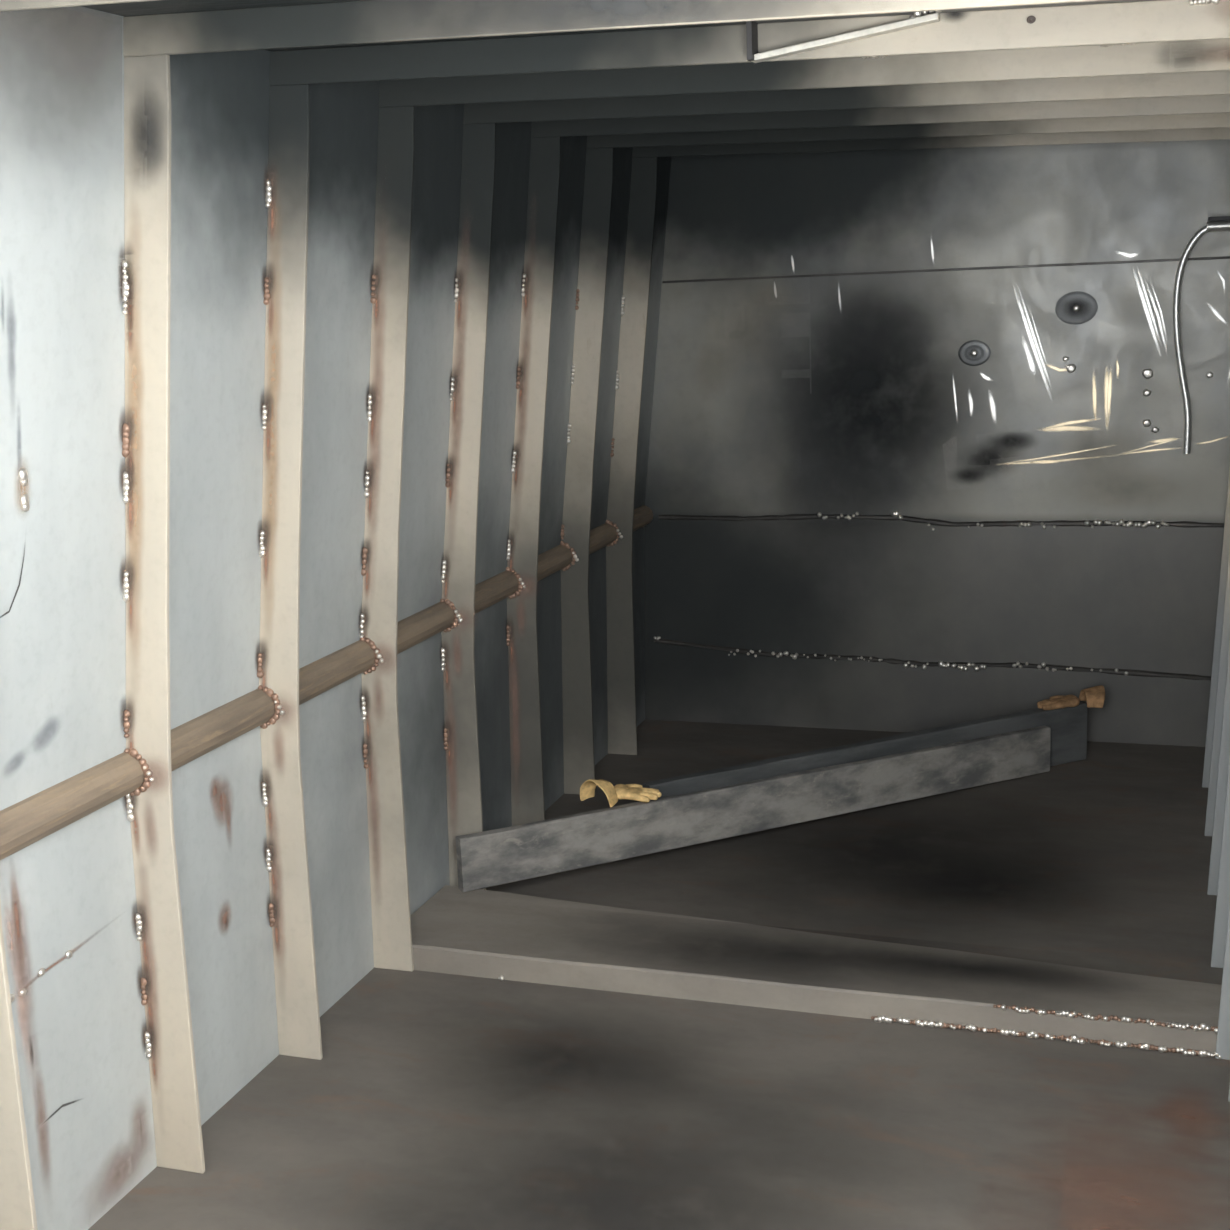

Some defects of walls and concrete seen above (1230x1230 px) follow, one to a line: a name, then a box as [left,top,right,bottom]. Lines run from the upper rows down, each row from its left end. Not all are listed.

rust [120,253,132,343]
rust [366,373,379,438]
rust [120,363,138,528]
rust [259,341,276,575]
rust [364,458,376,513]
rust [121,565,133,623]
rust [256,647,266,690]
rust [122,704,133,750]
rust [124,793,138,841]
rust [260,776,271,825]
rust [264,842,278,945]
rust [133,909,156,1077]